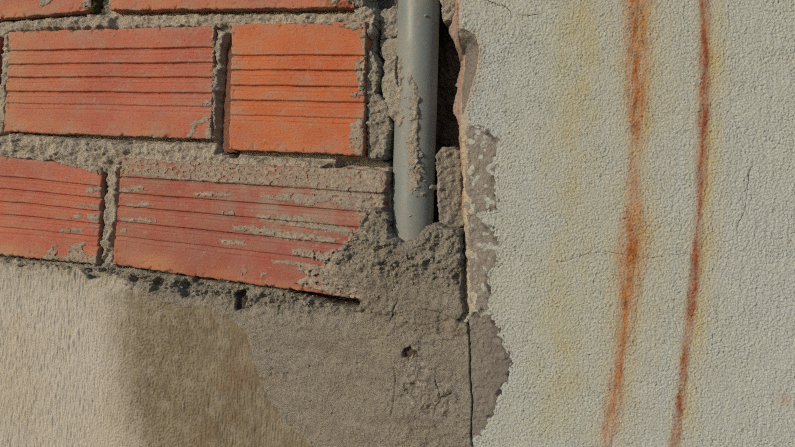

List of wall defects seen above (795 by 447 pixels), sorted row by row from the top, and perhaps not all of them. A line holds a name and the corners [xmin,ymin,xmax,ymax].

leakage [91,283,309,447]
spalling [460,28,479,114]
peeling [463,125,513,439]
corrosion [574,0,733,447]